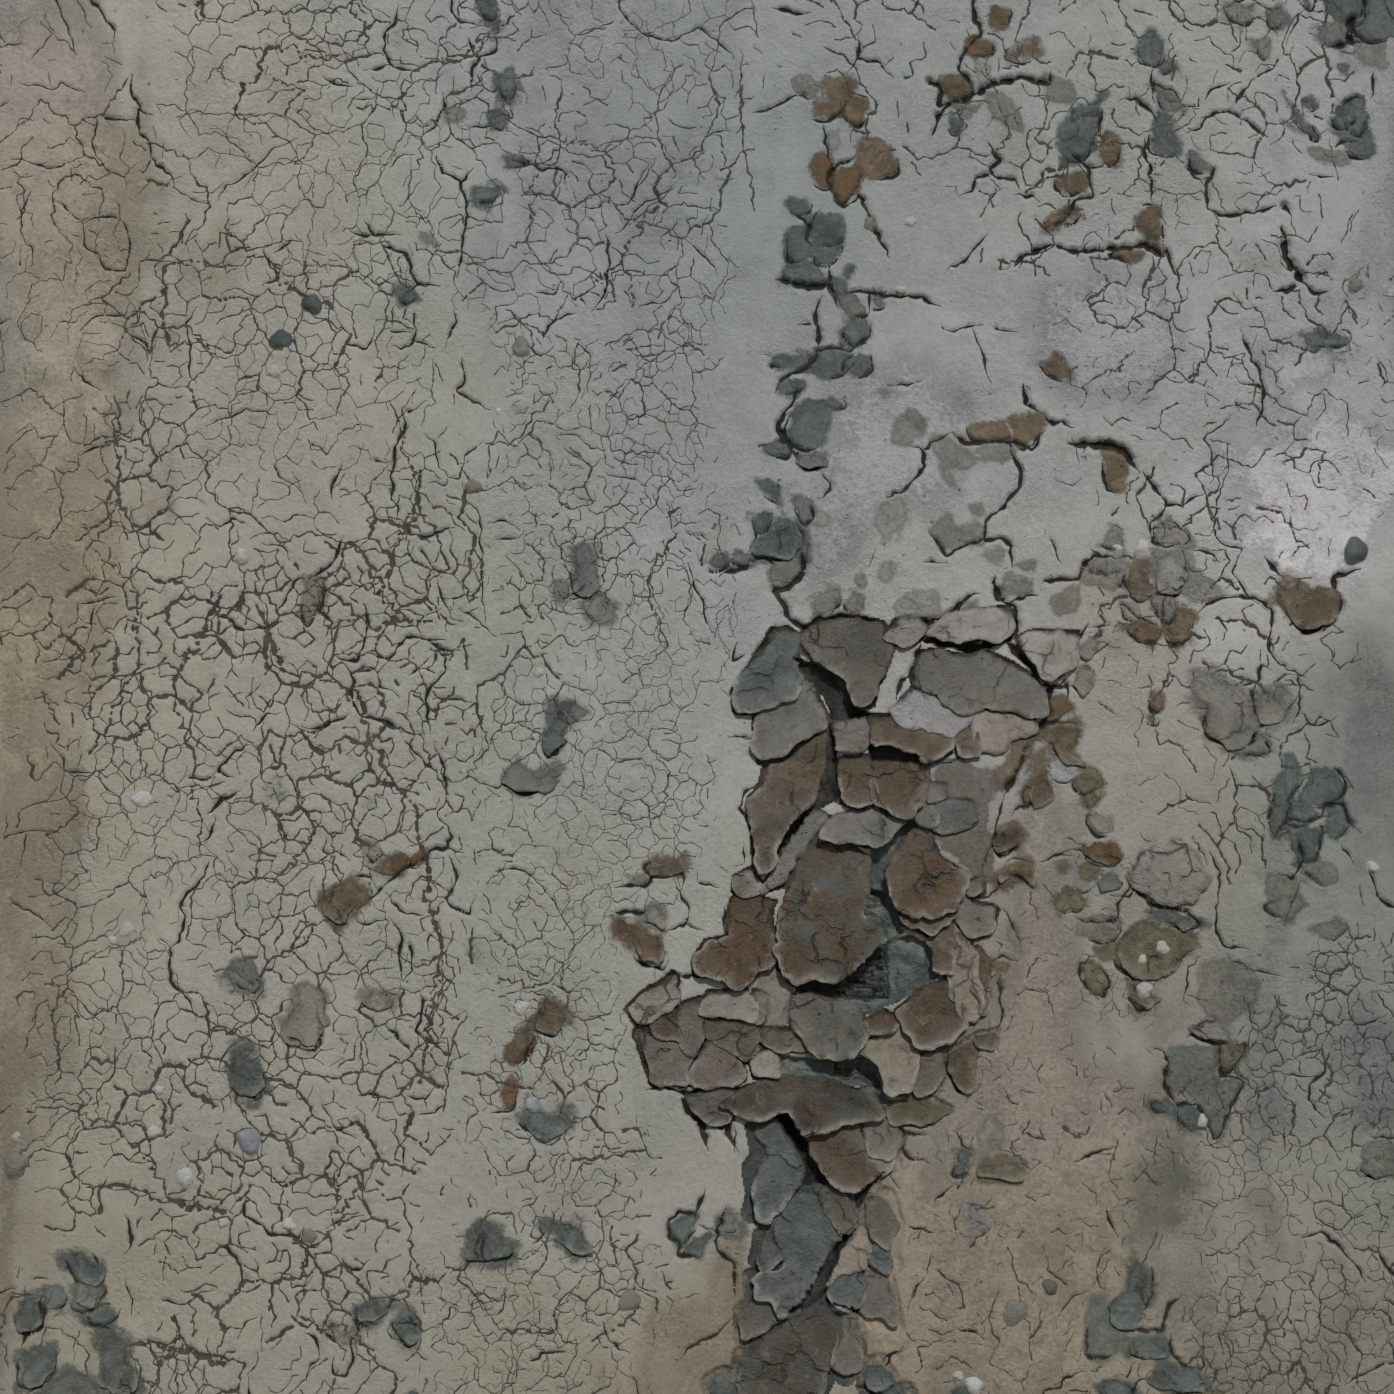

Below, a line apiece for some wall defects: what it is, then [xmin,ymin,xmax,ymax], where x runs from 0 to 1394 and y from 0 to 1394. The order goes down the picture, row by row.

peeling [939,5,1044,136]
peeling [1042,73,1122,233]
peeling [1223,0,1394,76]
peeling [1282,90,1376,166]
peeling [764,75,900,472]
peeling [890,408,1048,487]
peeling [709,478,829,583]
crack [0,0,873,1394]
crack [758,0,1394,1394]
peeling [1188,664,1357,940]
peeling [611,499,1261,1394]
peeling [13,1251,146,1394]